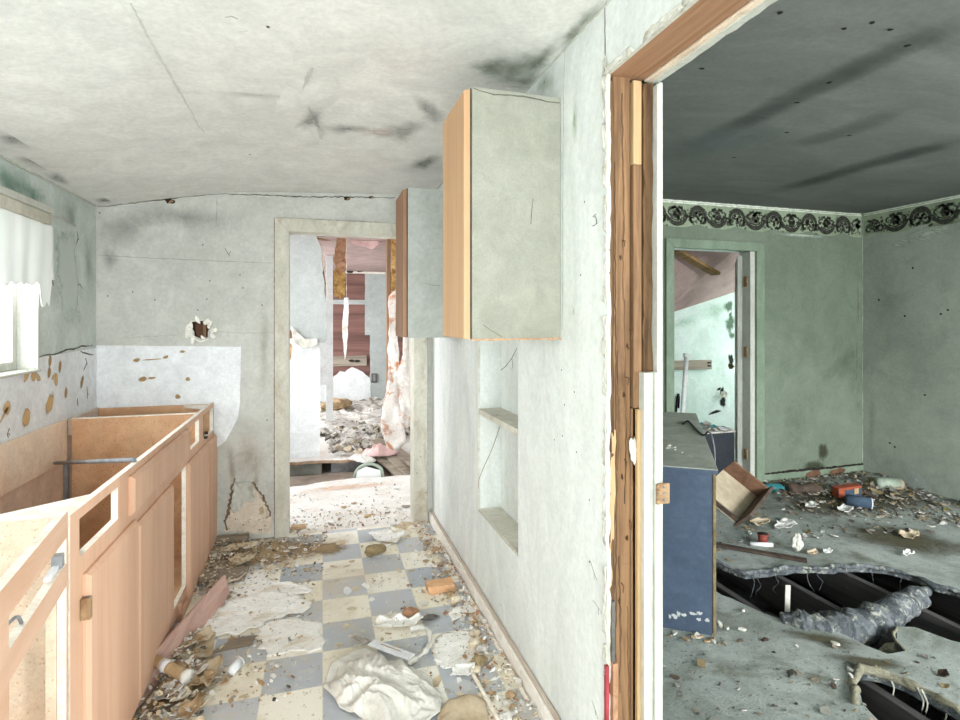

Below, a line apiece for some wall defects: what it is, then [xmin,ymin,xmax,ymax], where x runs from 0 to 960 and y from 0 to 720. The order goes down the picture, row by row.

crack [130,3,205,133]
spalling [185,315,218,345]
crack [40,345,94,405]
damp [805,445,827,469]
flaking render [223,478,272,534]